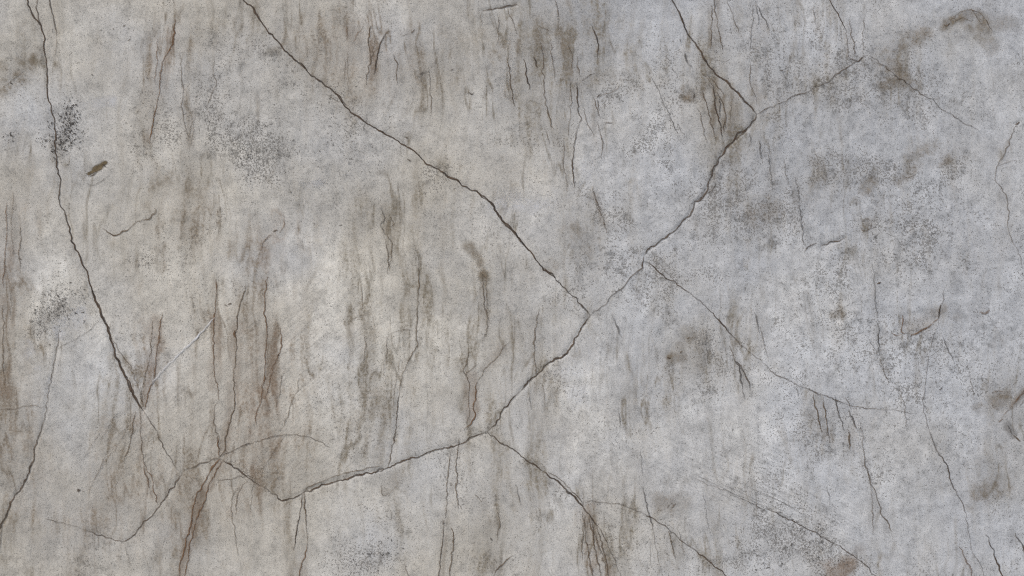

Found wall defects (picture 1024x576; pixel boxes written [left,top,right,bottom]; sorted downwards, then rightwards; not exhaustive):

water stain [36,91,85,165]
crack [27,0,596,541]
crack [611,0,861,296]
crack [0,407,47,542]